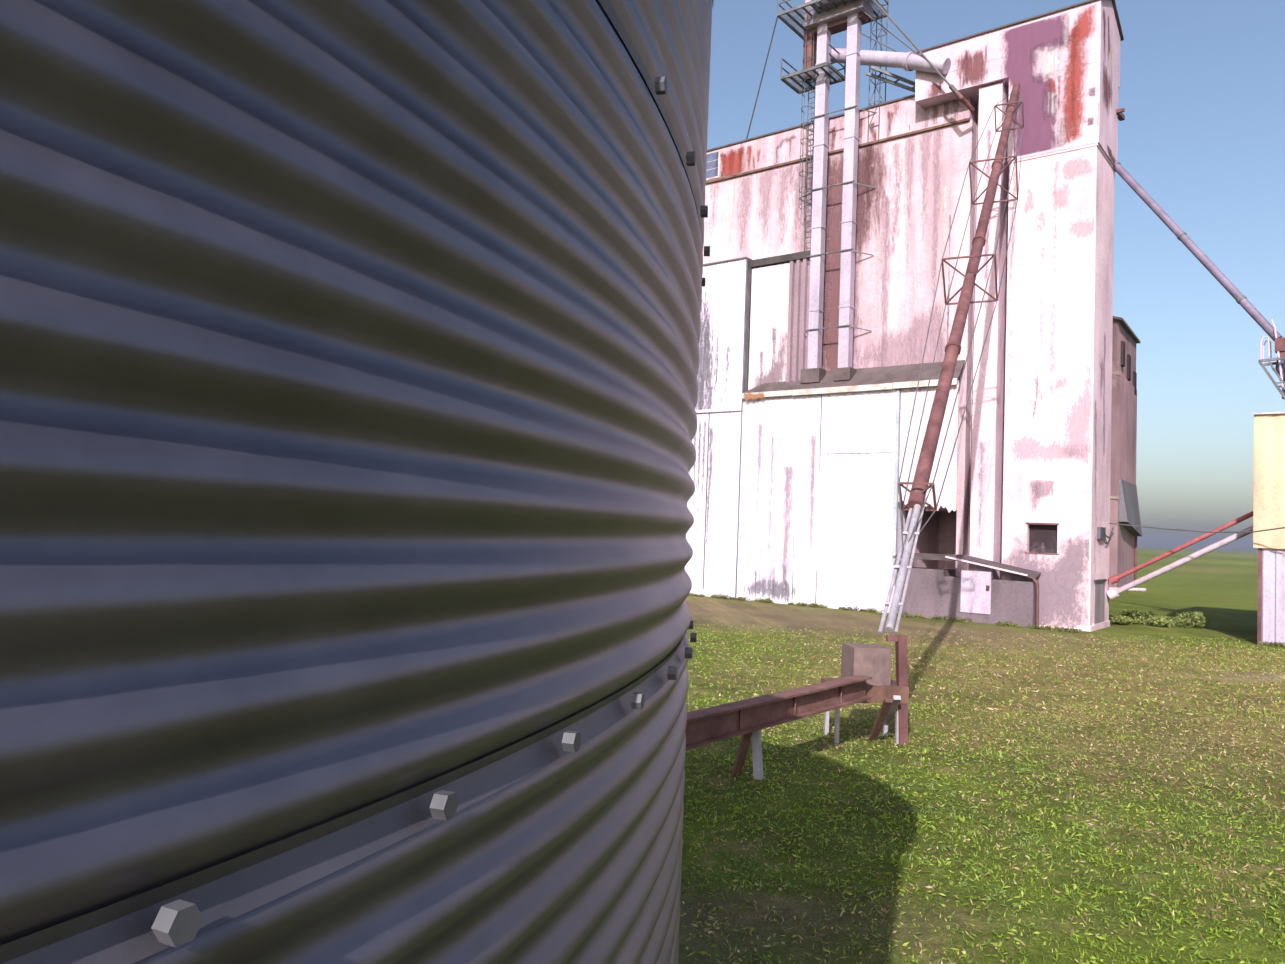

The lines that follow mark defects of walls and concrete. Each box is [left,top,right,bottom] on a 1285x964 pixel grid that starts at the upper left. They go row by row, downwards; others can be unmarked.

damp [689,293,730,542]
damp [1012,336,1115,485]
damp [744,424,795,602]